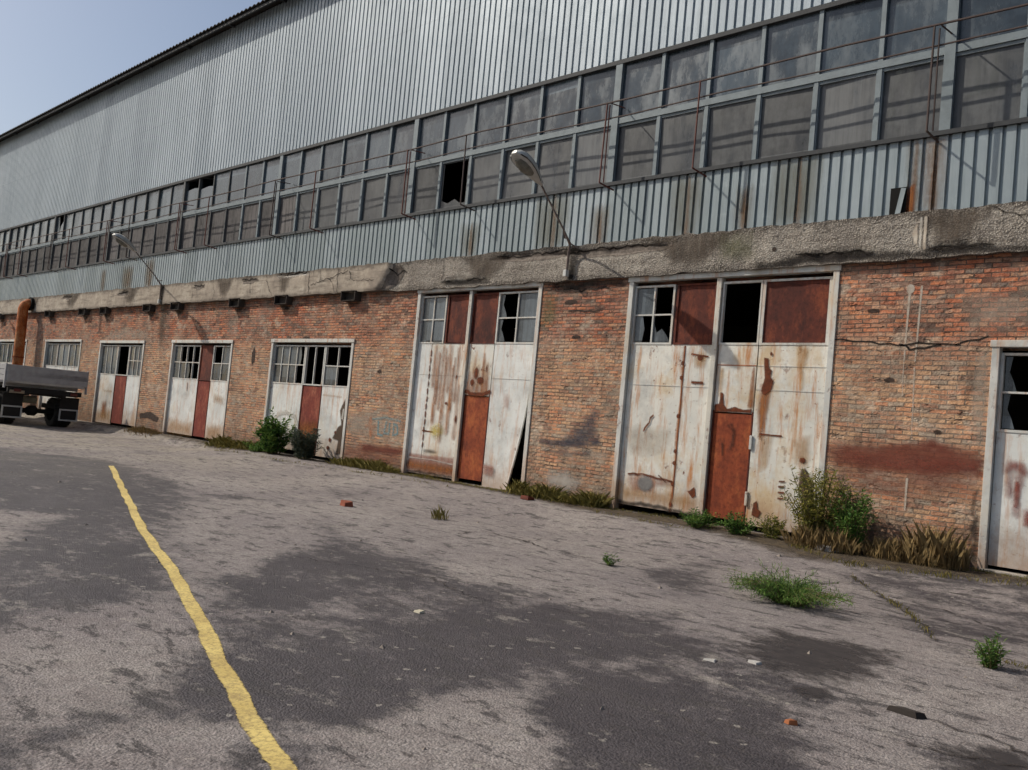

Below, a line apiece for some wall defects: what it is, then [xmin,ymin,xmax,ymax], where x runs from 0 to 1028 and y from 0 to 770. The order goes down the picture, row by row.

rust [906,185,914,212]
crack [835,335,989,351]
rust [422,348,490,446]
rust [618,347,709,516]
rust [714,352,782,437]